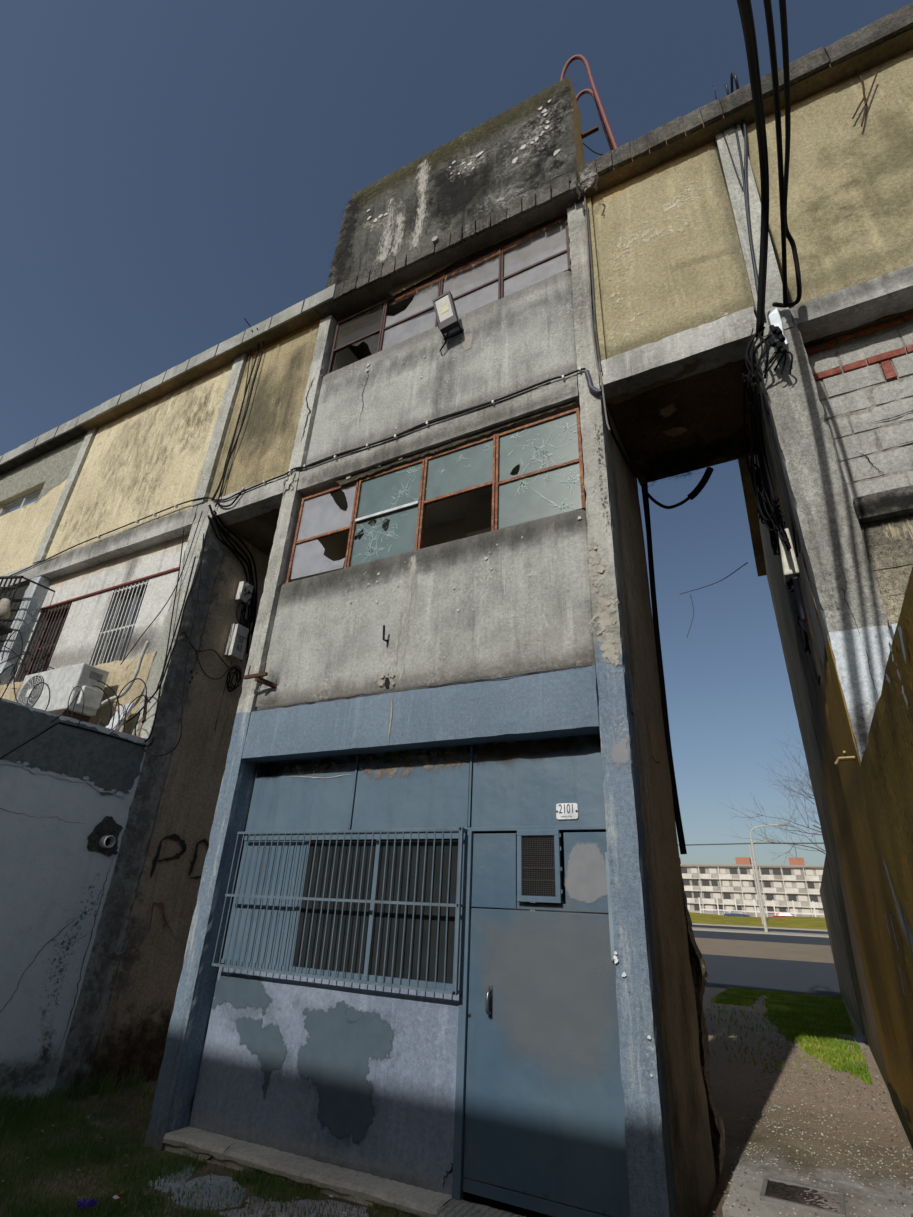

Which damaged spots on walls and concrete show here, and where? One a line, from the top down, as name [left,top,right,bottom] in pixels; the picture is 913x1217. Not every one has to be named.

leakage [377,87,573,262]
leakage [329,195,362,285]
peeling [0,700,146,796]
corrosion [365,738,593,778]
spalling [87,816,123,856]
leakage [0,532,226,1097]
peeling [882,855,913,952]
crack [0,858,113,1064]